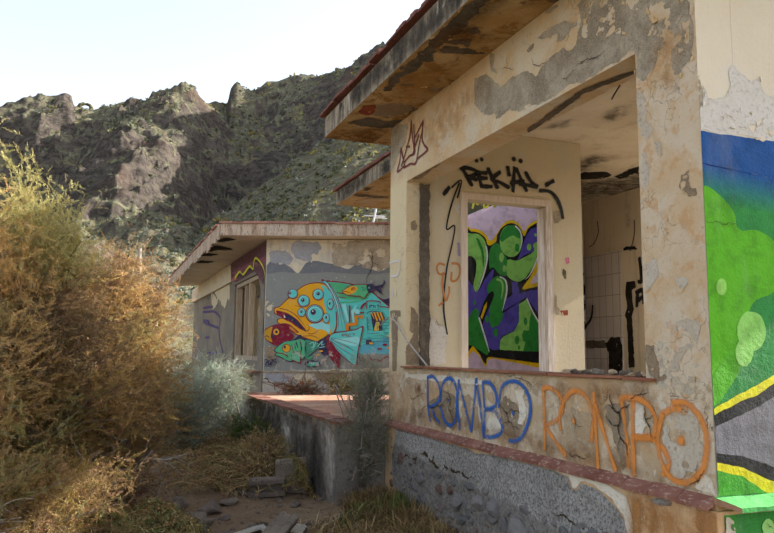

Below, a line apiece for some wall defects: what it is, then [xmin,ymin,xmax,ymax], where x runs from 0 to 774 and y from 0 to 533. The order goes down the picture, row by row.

leakage [334,129,382,144]
leakage [339,0,461,117]
peeling [383,0,694,156]
peeling [697,65,774,142]
peeling [581,152,650,188]
peeling [645,318,700,397]
peeling [486,415,503,434]
peeling [507,389,527,425]
crack [608,390,654,456]
peeling [634,403,647,435]
peeling [655,409,717,497]
peeling [562,473,645,533]